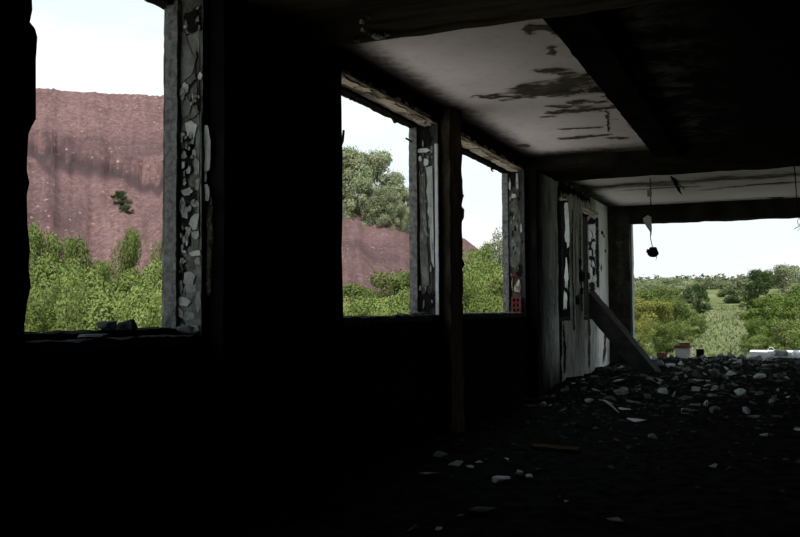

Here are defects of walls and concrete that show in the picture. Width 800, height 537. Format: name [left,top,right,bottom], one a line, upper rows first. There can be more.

water stain [521,25,558,37]
flaking render [177,6,213,335]
peeling [342,75,436,314]
peeling [461,138,523,306]
water stain [474,68,616,118]
peeling [564,202,606,309]
water stain [557,127,628,140]